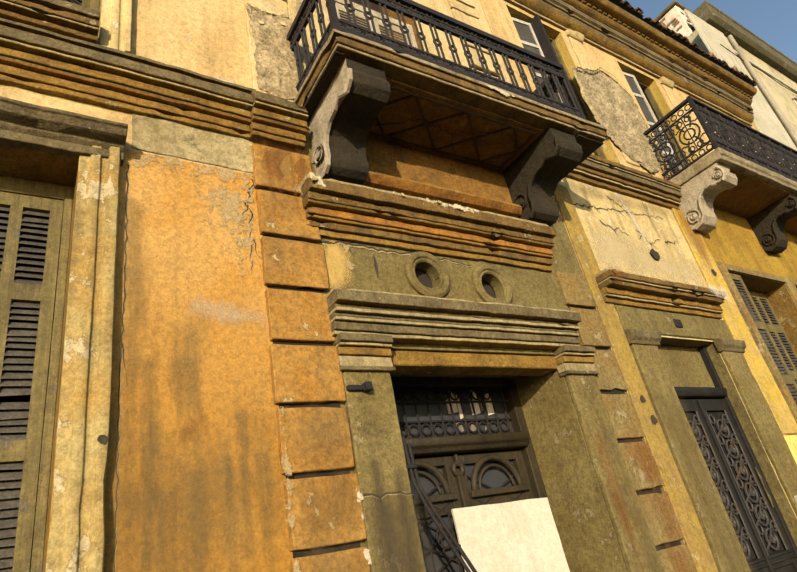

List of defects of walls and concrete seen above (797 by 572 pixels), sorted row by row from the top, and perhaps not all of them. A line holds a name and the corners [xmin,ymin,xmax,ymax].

flaking render [246,0,303,99]
flaking render [571,66,661,173]
peeling [124,150,255,279]
crack [574,196,676,250]
crack [113,164,130,572]